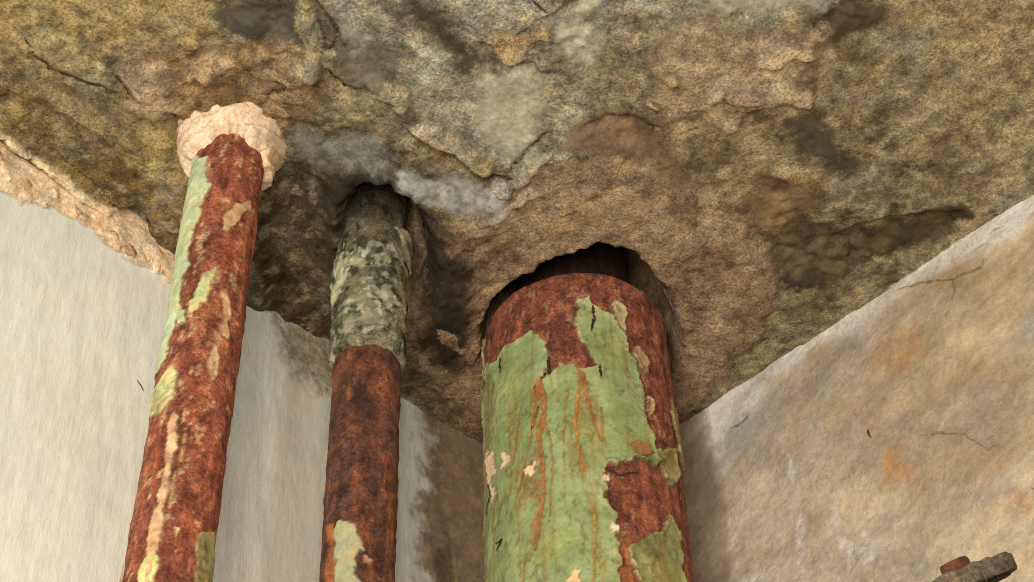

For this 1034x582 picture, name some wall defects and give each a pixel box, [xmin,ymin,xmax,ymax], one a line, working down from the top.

crack [24,37,134,99]
flaking render [486,25,551,67]
flaking render [646,14,829,135]
flaking render [19,80,149,161]
damp [781,113,860,176]
spalling [0,135,175,283]
damp [298,134,505,370]
spalling [330,77,868,486]
crack [899,261,983,300]
peeling [485,450,510,503]